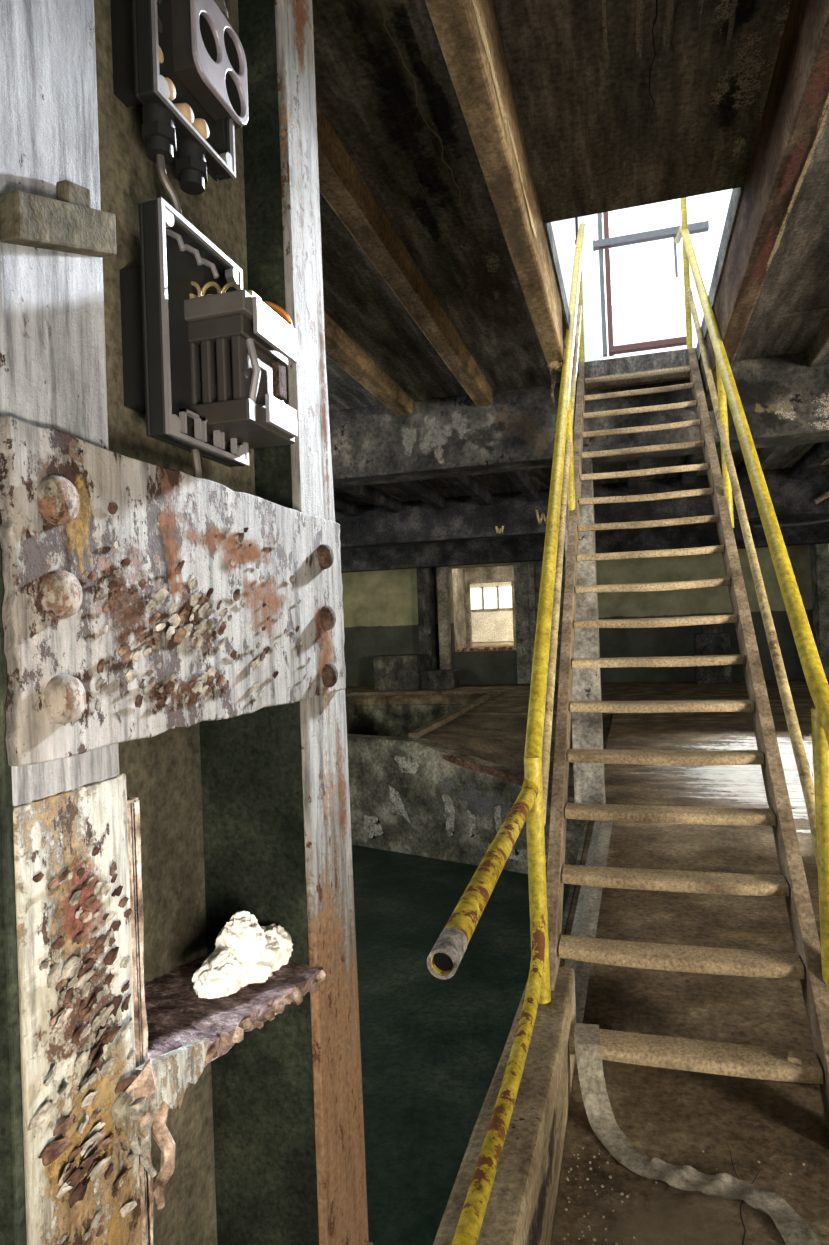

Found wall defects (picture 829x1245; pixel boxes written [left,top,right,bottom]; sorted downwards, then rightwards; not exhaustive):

water stain [472,0,537,240]
water stain [715,58,749,140]
water stain [402,411,470,464]
water stain [761,406,788,428]
corrosion [67,477,91,575]
corrosion [160,512,268,614]
corrosion [315,611,334,710]